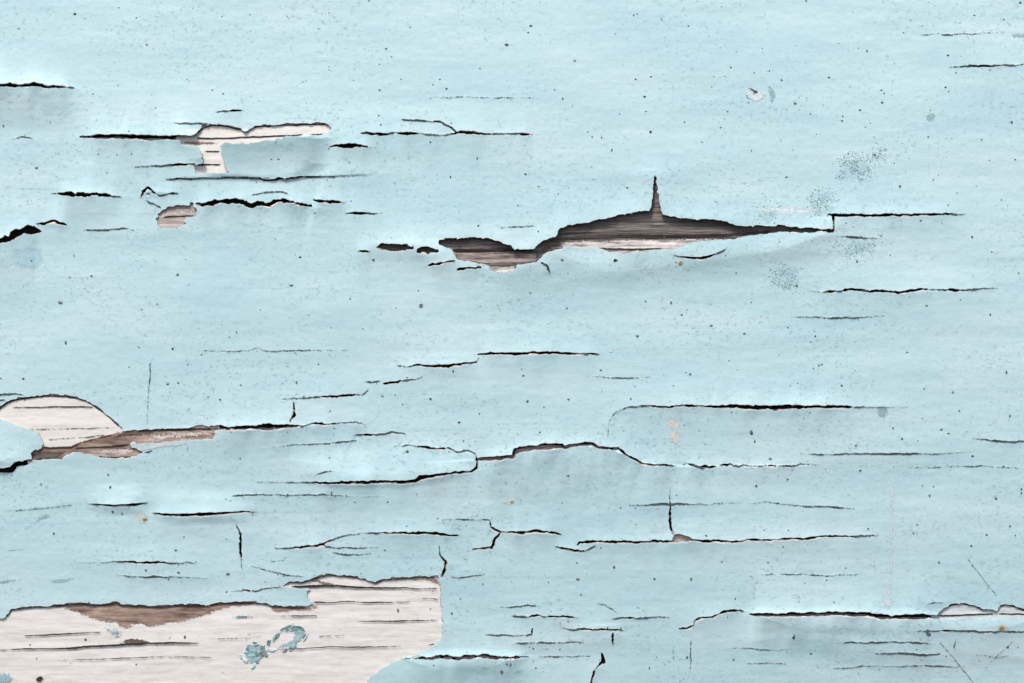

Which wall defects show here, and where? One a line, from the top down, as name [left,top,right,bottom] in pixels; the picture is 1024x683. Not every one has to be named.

crack [329,96,532,148]
peeling [176,123,331,174]
crack [0,220,132,243]
peeling [145,193,200,228]
peeling [378,177,834,273]
crack [828,213,963,239]
crack [797,287,993,319]
peeling [0,394,219,464]
crack [13,351,1024,592]
peeling [0,574,444,683]
crack [405,602,1024,683]
peeling [931,603,1024,620]